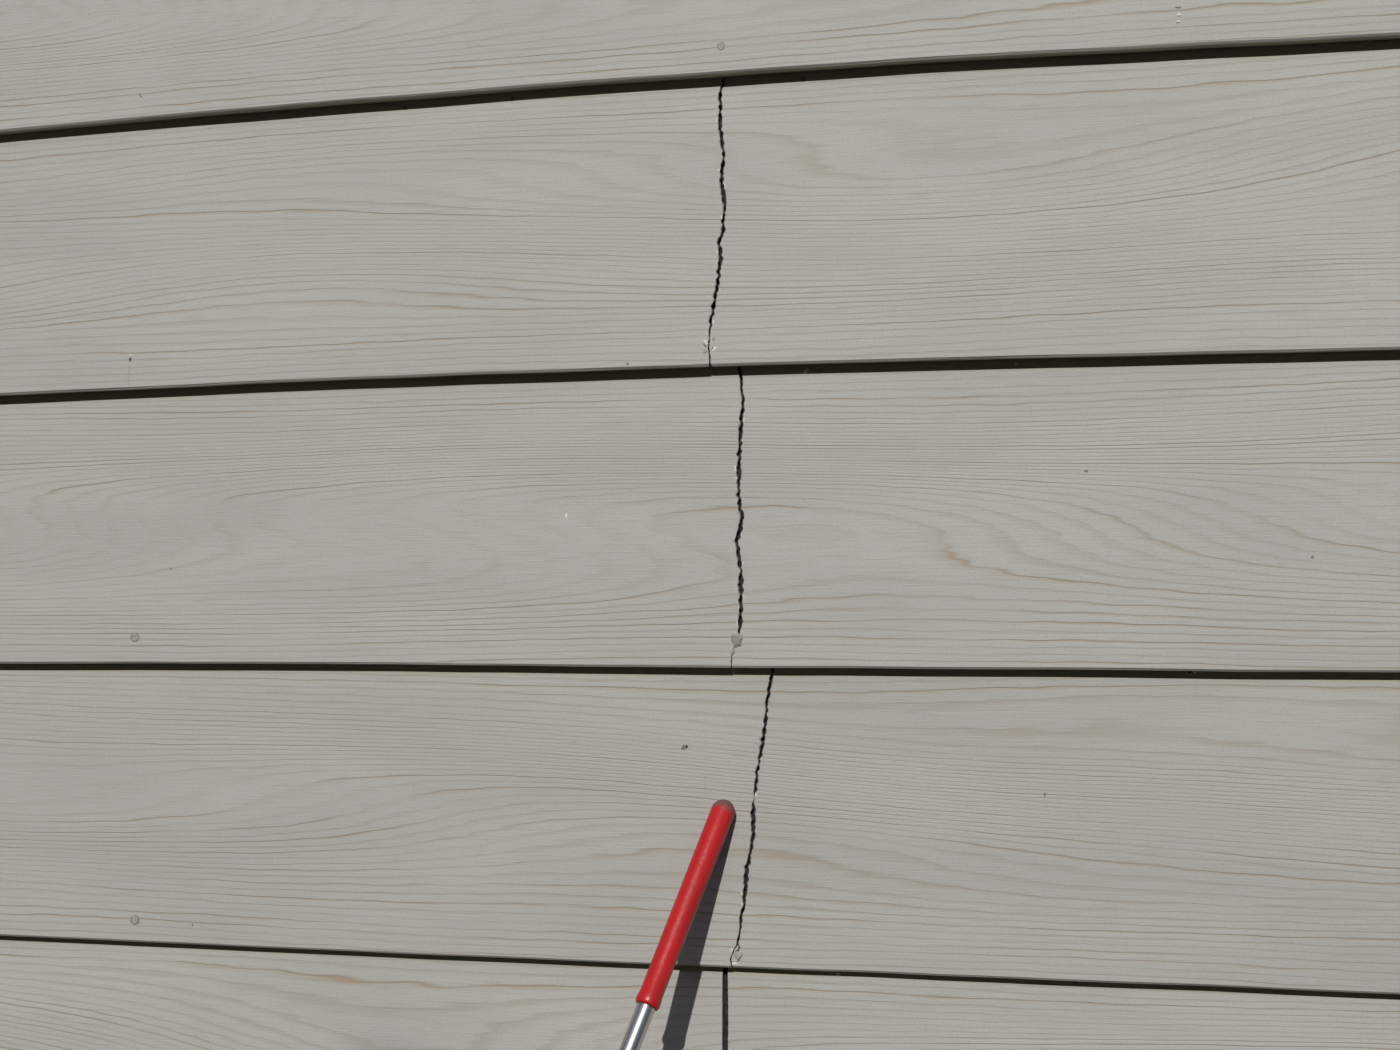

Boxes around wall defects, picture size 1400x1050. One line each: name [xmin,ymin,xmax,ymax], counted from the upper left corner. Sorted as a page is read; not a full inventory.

crack [703,93,745,656]
crack [730,668,774,965]